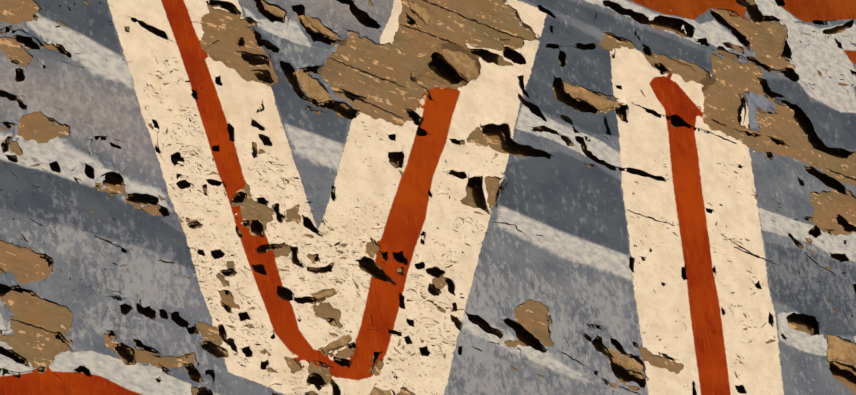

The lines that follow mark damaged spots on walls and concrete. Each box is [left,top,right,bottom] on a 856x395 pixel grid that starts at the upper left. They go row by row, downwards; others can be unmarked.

peeling [0,0,114,76]
peeling [189,0,856,284]
peeling [0,54,555,395]
peeling [722,278,790,344]
peeling [581,320,684,391]